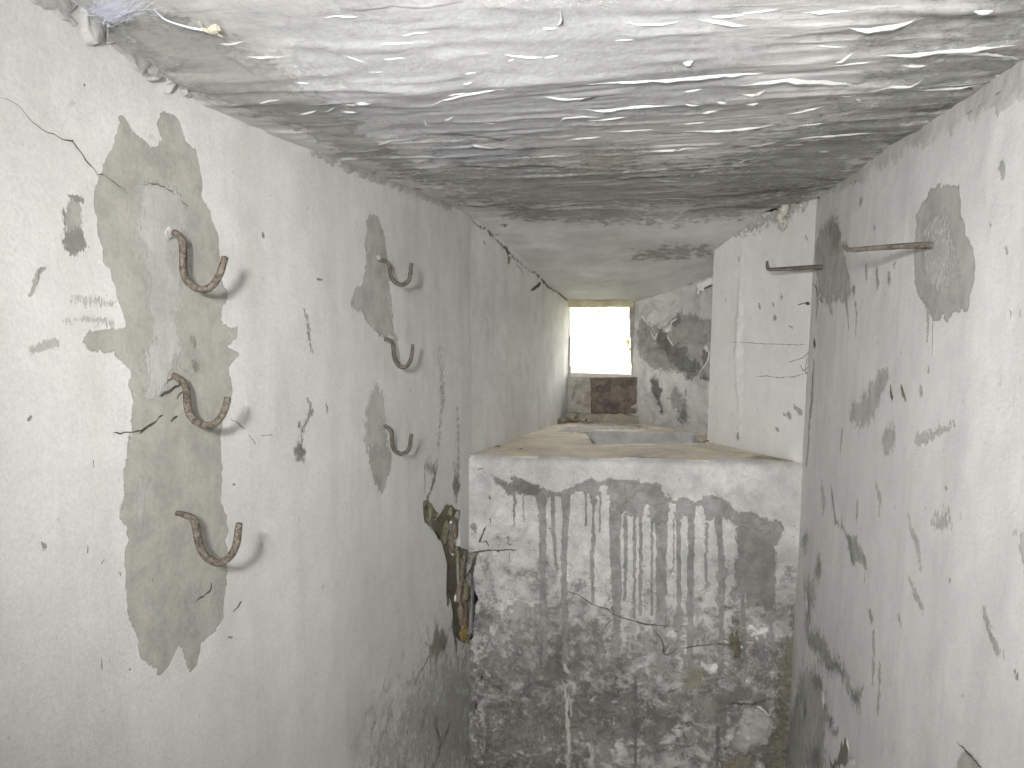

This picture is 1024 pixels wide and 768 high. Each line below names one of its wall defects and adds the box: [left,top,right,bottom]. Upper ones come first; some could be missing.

crack [3,98,189,207]
flaking render [697,277,713,294]
water stain [650,376,692,425]
spalling [415,500,481,683]
water stain [380,474,794,768]
crack [570,592,729,656]